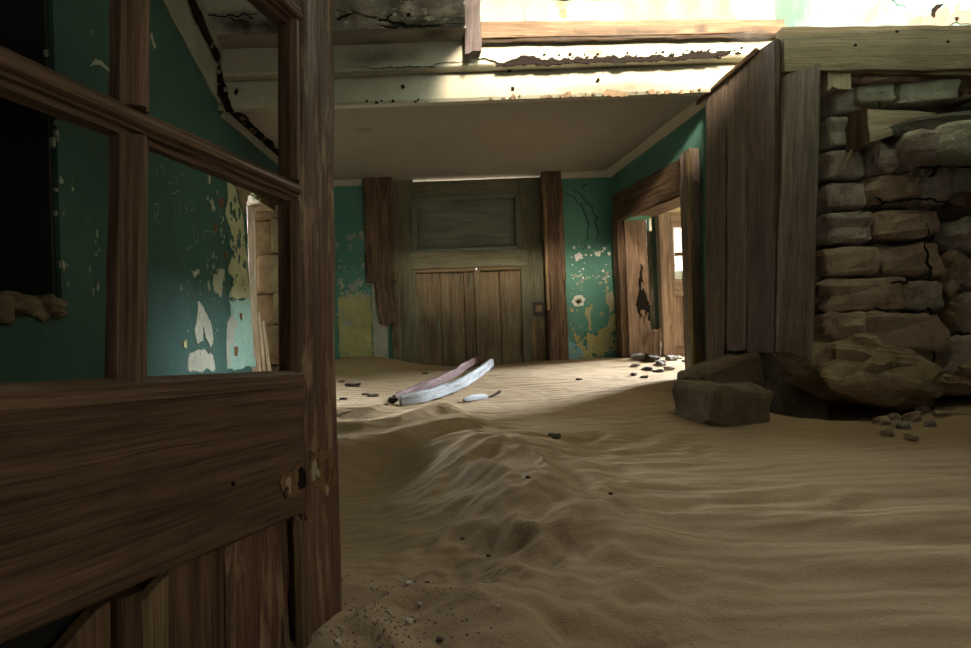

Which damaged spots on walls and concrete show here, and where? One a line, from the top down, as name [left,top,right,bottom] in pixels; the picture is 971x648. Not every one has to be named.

crack [208,12,259,23]
crack [336,10,466,29]
flaking render [910,0,971,26]
spalling [496,47,743,67]
peeling [180,174,261,373]
peeling [335,230,373,358]
peeling [568,245,617,359]